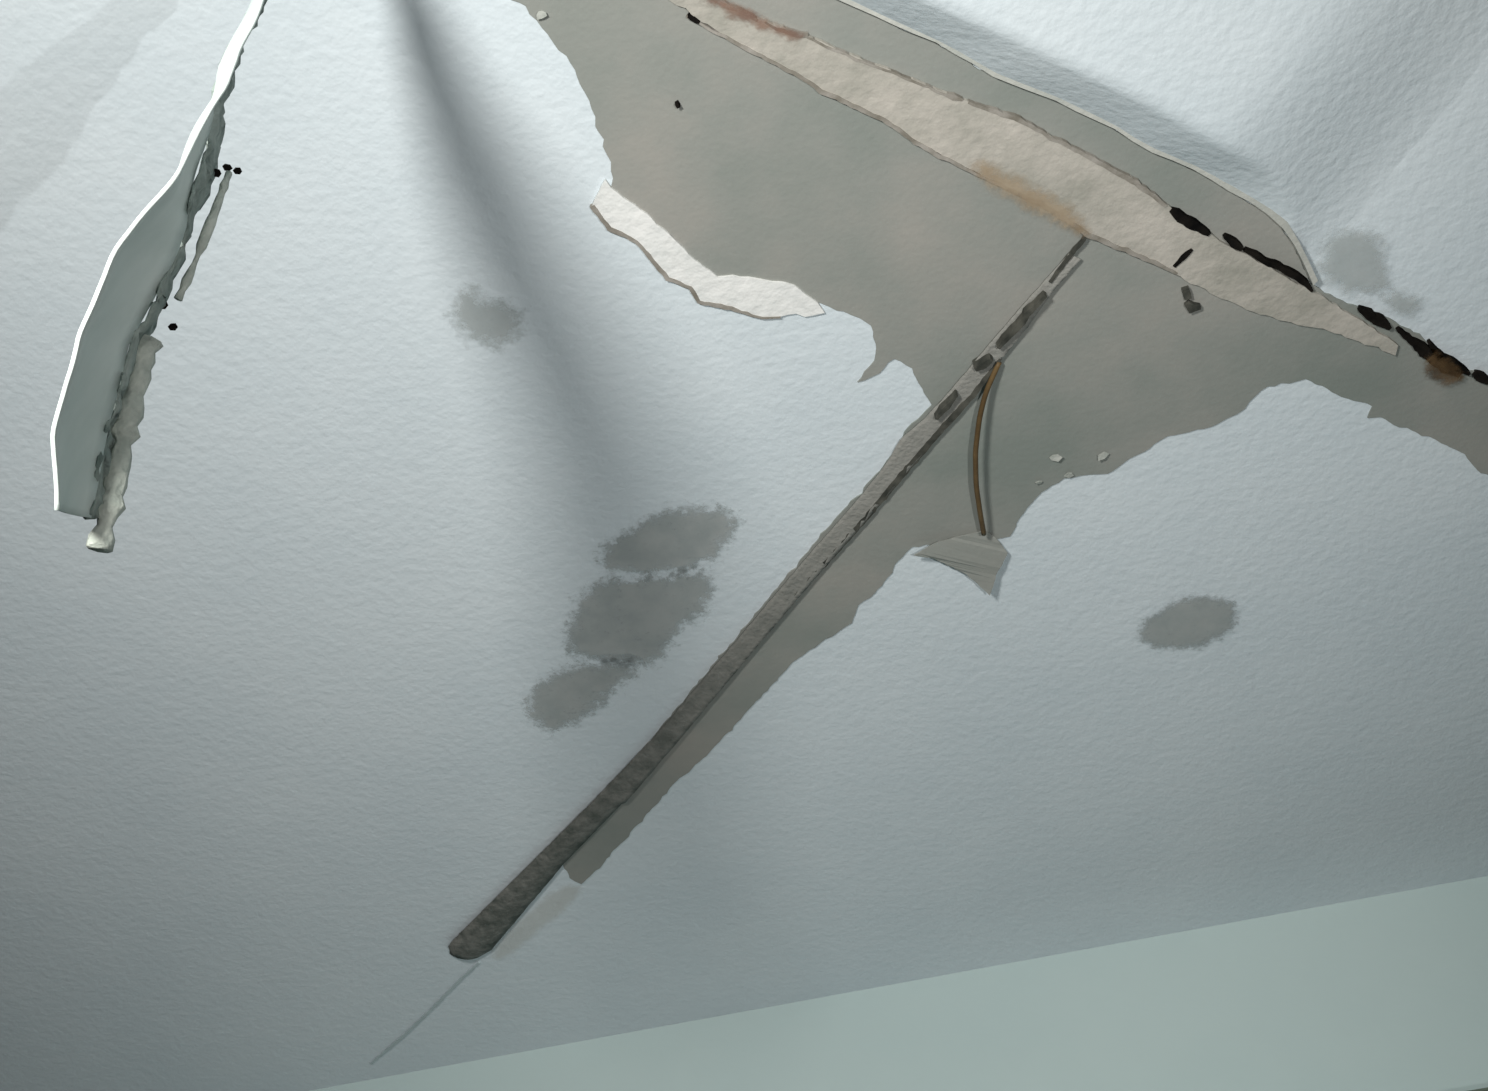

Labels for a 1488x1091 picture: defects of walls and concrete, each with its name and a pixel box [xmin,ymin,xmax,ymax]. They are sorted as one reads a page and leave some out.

peeling [513,0,1488,884]
corrosion [1426,355,1464,385]
damp [525,504,738,730]
damp [1140,596,1236,648]